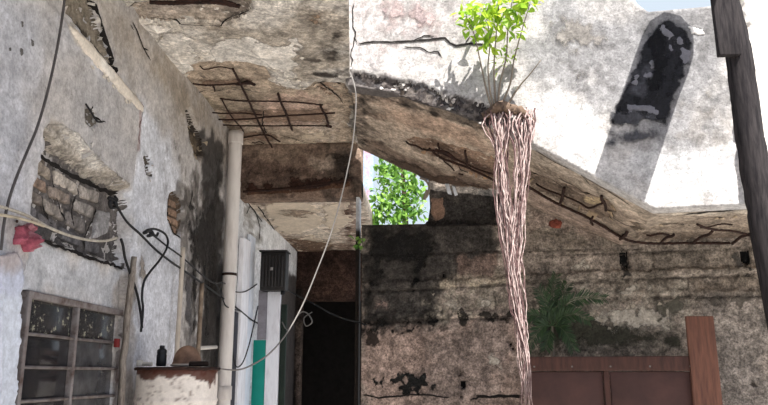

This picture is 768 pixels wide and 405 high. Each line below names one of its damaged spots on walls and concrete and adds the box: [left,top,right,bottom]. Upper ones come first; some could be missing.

spalling [65,0,122,79]
crack [131,23,151,59]
spalling [131,0,491,148]
crack [350,4,483,66]
damp [607,20,692,146]
spalling [85,106,105,131]
spalling [185,110,208,160]
flaking render [30,124,130,270]
flaking render [167,192,181,238]
damp [184,192,216,336]
damp [368,230,437,296]
damp [363,291,515,347]